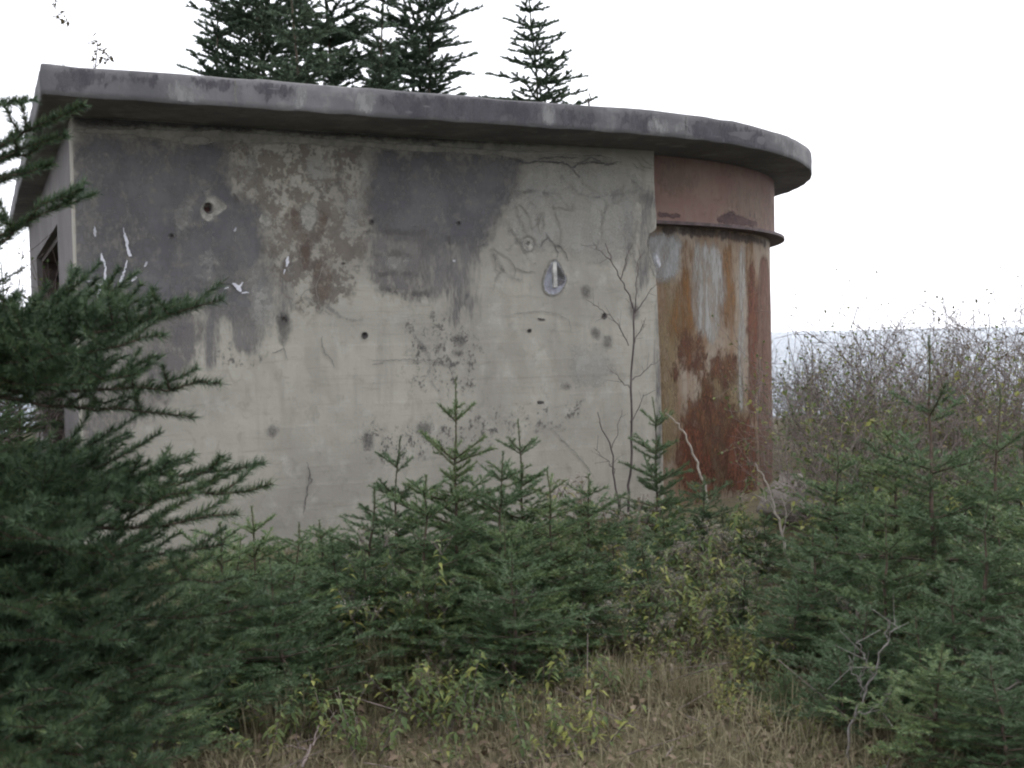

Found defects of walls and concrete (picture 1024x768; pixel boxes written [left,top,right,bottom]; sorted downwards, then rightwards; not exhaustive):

spalling [201,192,239,222]
damp [73,117,523,443]
corrosion [658,227,773,502]